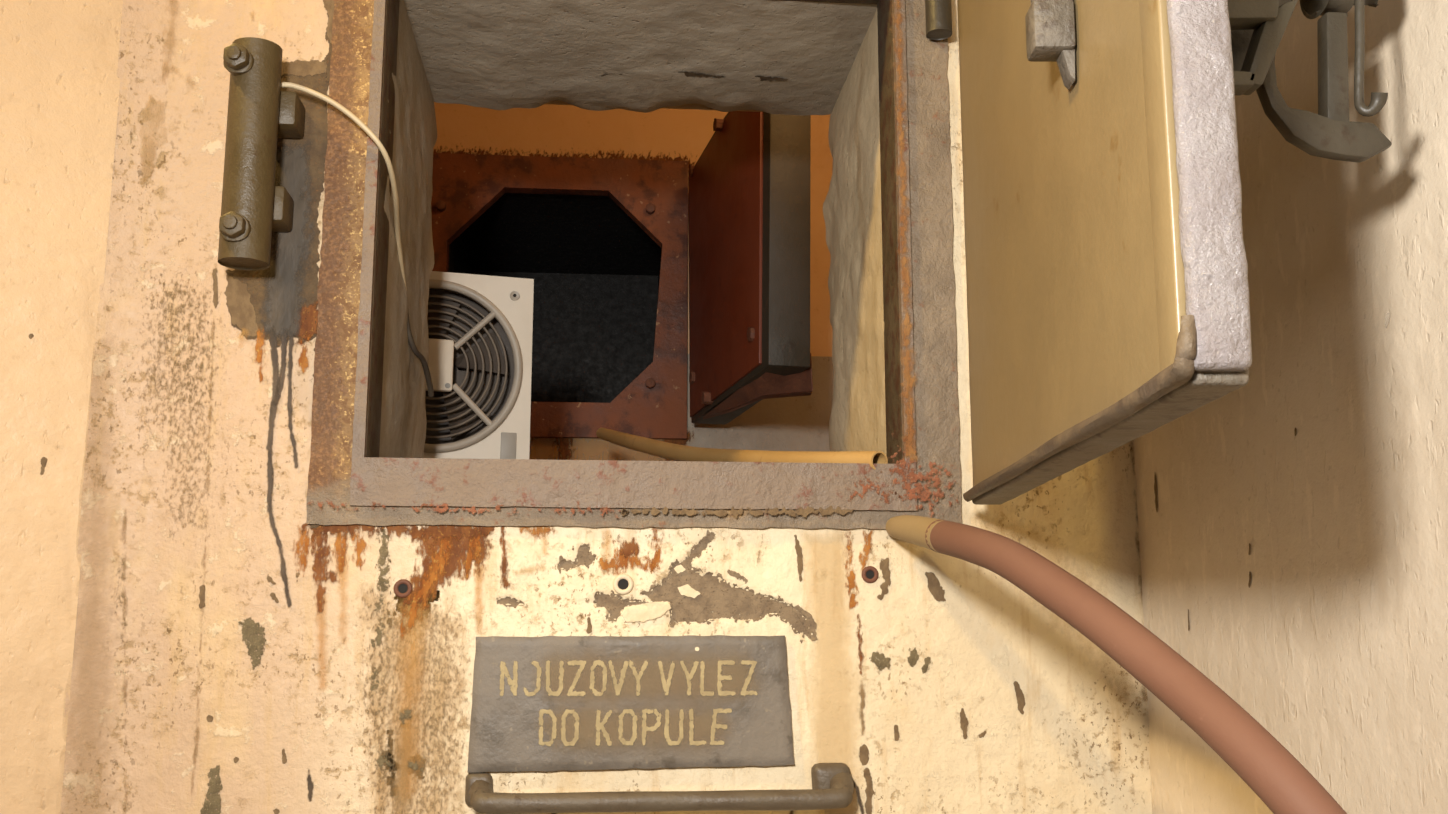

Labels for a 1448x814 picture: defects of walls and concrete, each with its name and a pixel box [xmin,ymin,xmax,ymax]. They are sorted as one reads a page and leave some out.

corrosion [255,328,265,382]
leakage [263,143,313,607]
corrosion [295,0,958,637]
peeling [238,617,266,669]
peeling [587,530,818,643]
leakage [360,586,467,814]
peeling [200,757,239,814]